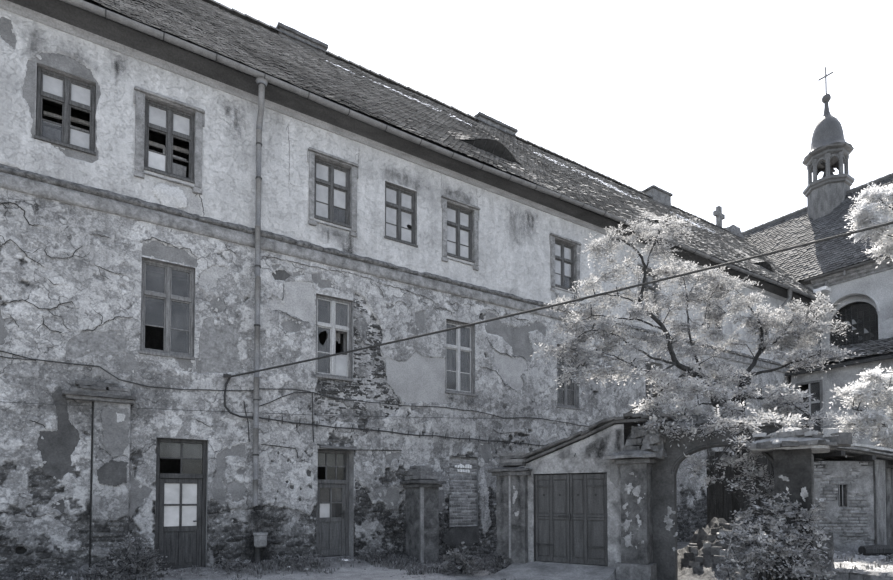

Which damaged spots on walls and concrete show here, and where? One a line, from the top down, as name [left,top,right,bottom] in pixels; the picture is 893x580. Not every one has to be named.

spalling [0,17,17,50]
crack [0,202,46,227]
crack [0,234,133,336]
spalling [269,262,335,332]
crack [261,256,528,326]
flaking render [314,293,453,424]
crack [484,333,534,390]
spalling [37,386,80,480]
flaking render [0,499,90,578]
spalling [97,460,152,519]
flaking render [207,444,316,568]
flaking render [354,480,403,555]